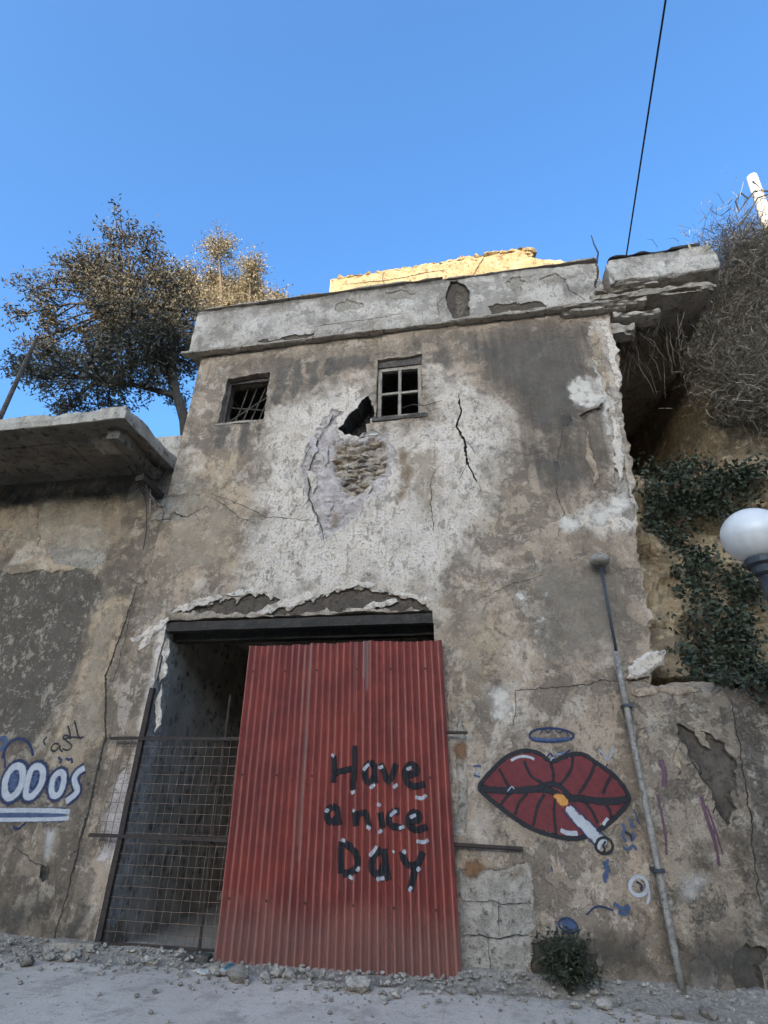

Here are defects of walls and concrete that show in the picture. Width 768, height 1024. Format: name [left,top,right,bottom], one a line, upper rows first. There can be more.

spalling [445,281,470,319]
crack [155,411,341,540]
spalling [299,395,398,541]
crack [403,393,477,532]
peeling [559,281,716,533]
crack [54,583,139,938]
peeling [130,579,434,733]
crack [513,679,638,726]
peeling [631,685,700,697]
spalling [673,724,738,825]
spalling [731,943,768,990]